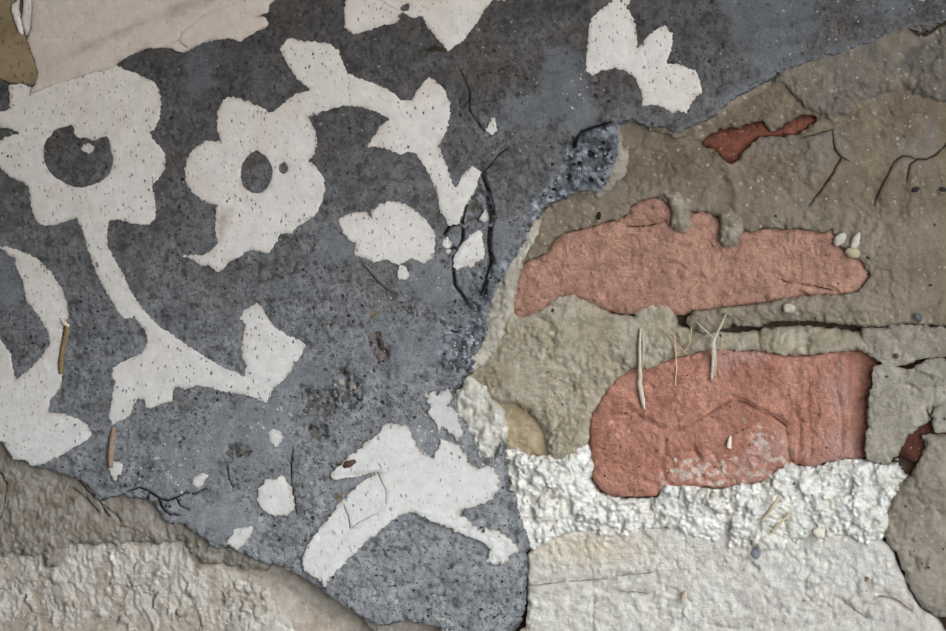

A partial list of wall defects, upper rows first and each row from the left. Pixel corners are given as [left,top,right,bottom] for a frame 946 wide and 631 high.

peeling [0,0,38,85]
crack [444,149,508,309]
spalling [458,183,495,229]
flaking render [514,197,871,316]
crack [803,128,849,205]
crack [874,144,946,206]
flaking render [589,349,880,497]
flaking render [899,420,946,463]
crack [73,480,206,521]
peeling [257,475,296,516]
flaking render [0,540,454,631]
flaking render [526,527,945,631]